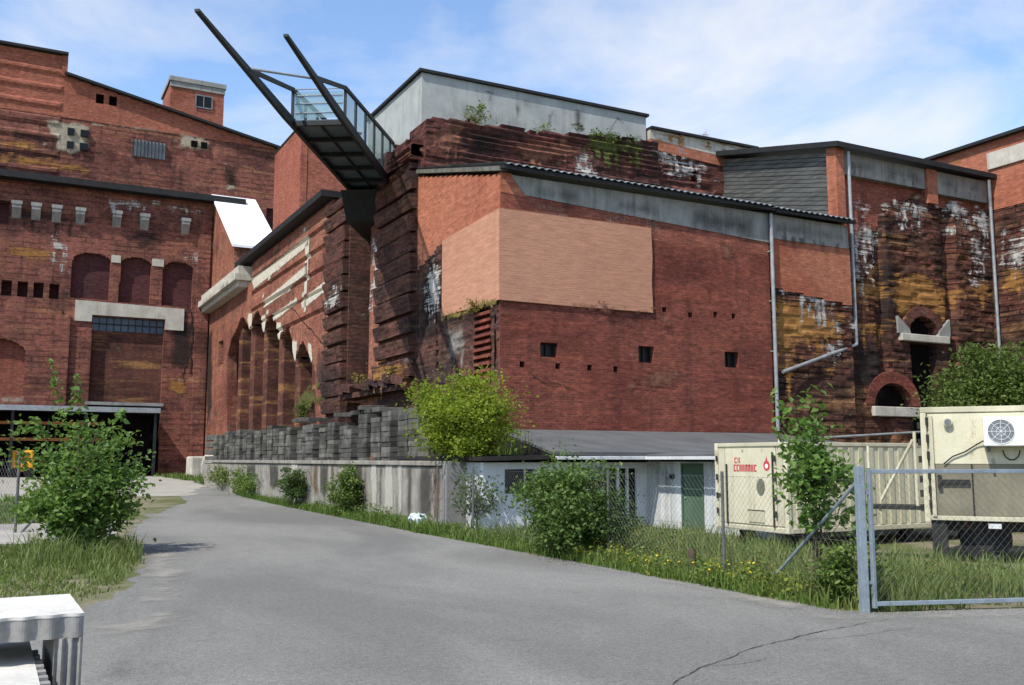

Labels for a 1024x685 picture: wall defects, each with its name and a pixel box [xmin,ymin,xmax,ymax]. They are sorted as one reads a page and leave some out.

damp [654,147,707,187]
damp [848,199,1024,295]
damp [424,255,441,317]
damp [779,290,856,361]